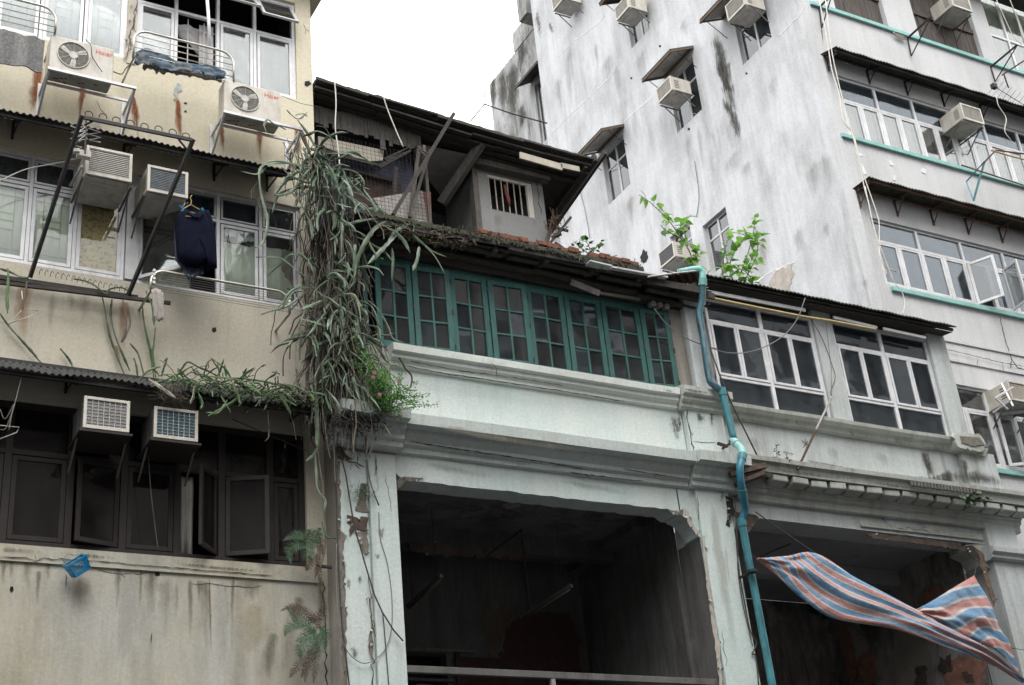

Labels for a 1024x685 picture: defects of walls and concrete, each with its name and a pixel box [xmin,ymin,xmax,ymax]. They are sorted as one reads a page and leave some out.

rust [31,72,41,102]
damp [713,40,739,134]
peeling [769,263,794,291]
peeling [336,446,370,685]
peeling [668,509,723,685]
spalling [866,533,997,606]